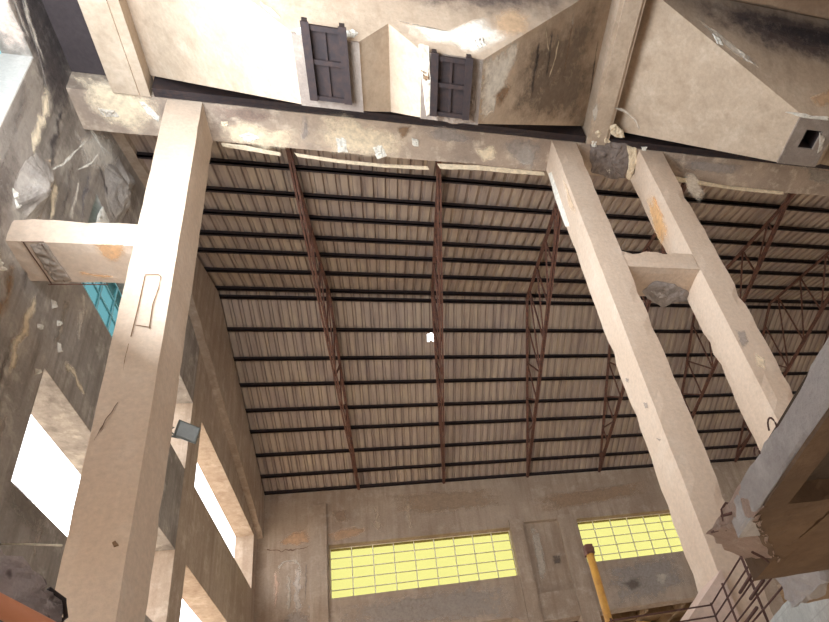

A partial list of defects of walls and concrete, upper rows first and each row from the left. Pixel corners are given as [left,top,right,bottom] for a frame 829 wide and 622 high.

damp [14,0,113,216]
peeling [92,85,160,128]
damp [415,0,539,50]
damp [482,48,516,113]
damp [517,7,597,119]
damp [725,9,829,61]
spalling [589,124,647,180]
spalling [642,281,689,308]
spalling [706,479,829,564]